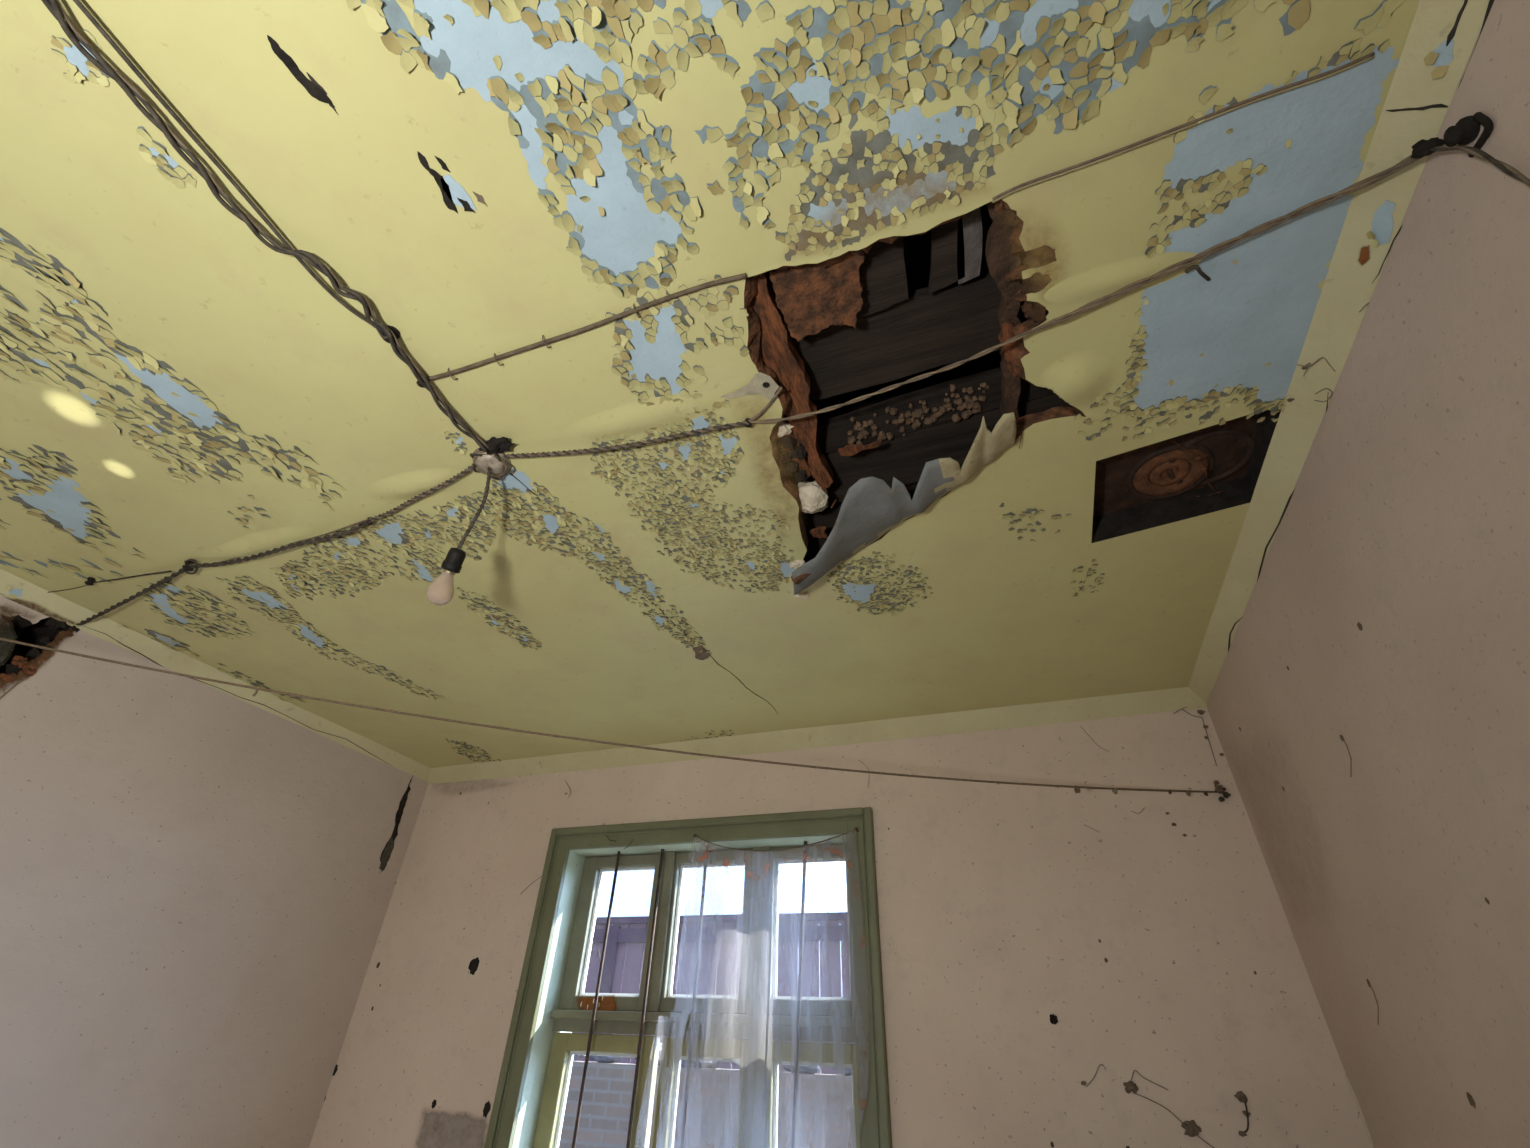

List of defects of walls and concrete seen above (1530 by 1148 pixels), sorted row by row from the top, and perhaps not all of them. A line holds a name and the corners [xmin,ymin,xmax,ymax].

peeling [50,29,110,86]
peeling [1424,39,1454,79]
crack [1386,0,1494,112]
peeling [136,126,197,188]
peeling [1075,0,1404,442]
peeling [346,0,1310,597]
peeling [0,227,346,529]
peeling [0,444,712,703]
peeling [827,551,933,617]